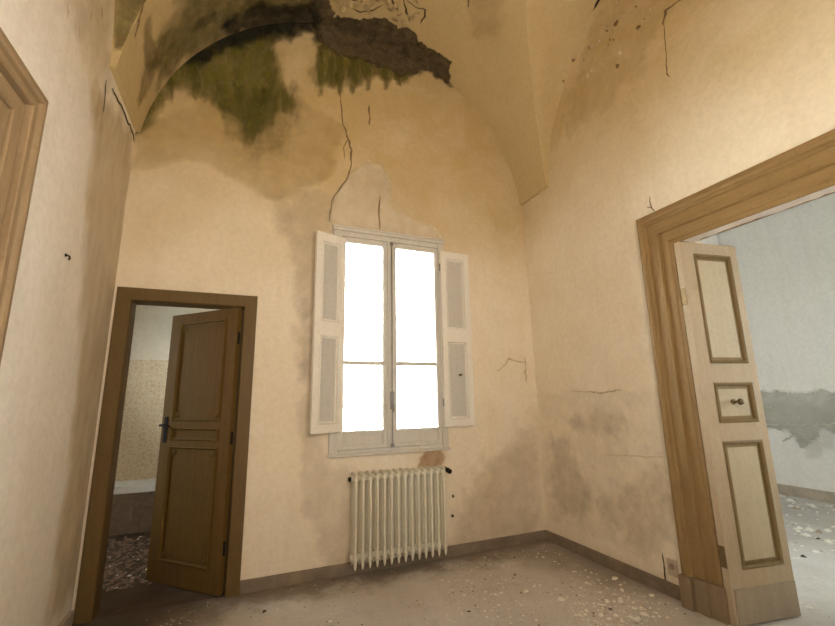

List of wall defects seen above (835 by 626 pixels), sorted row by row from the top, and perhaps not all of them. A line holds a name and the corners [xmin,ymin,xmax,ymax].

crack [103,80,134,141]
damp [136,0,319,138]
flaking render [310,0,452,87]
crack [662,0,681,77]
crack [329,93,352,221]